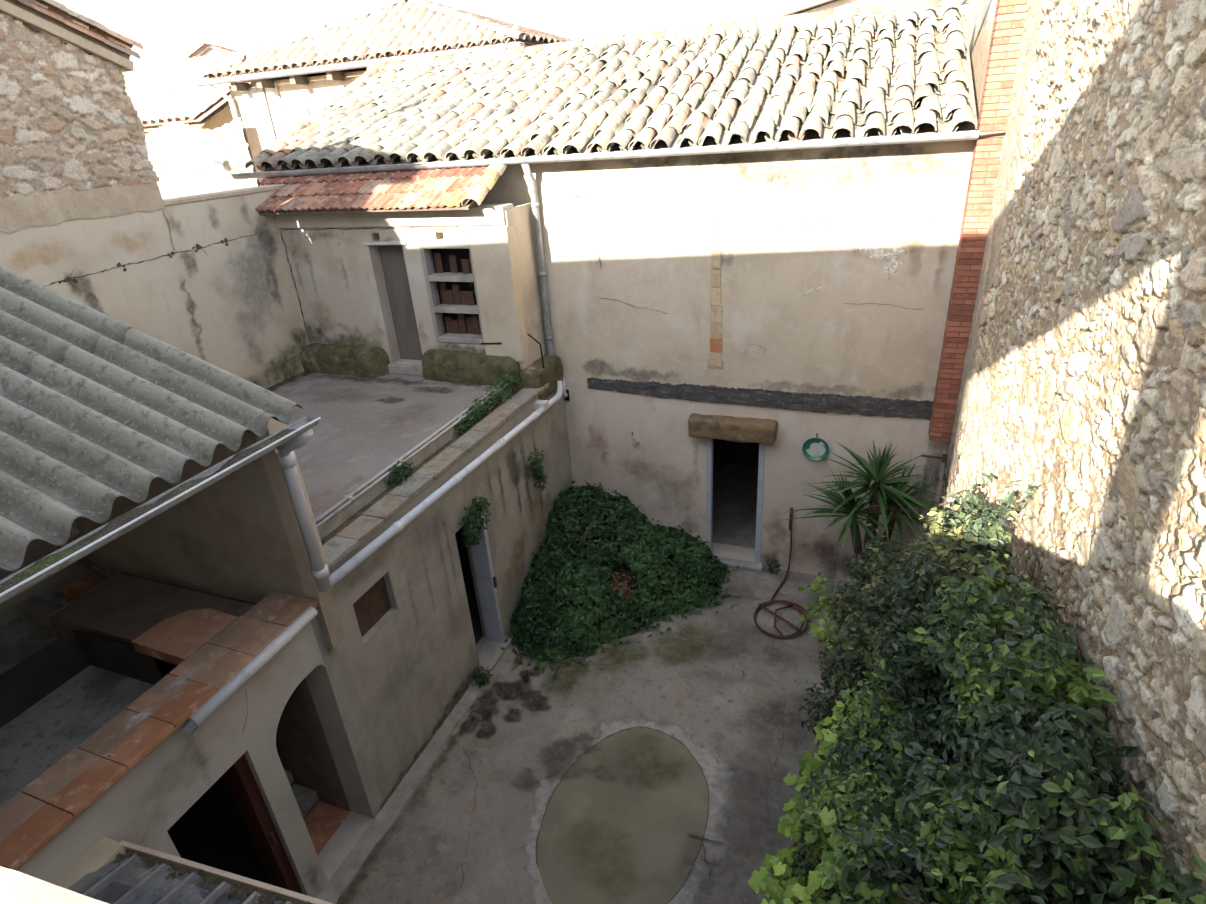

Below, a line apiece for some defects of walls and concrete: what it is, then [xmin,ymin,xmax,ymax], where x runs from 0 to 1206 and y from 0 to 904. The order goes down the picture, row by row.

damp [694,148,879,190]
damp [888,144,954,175]